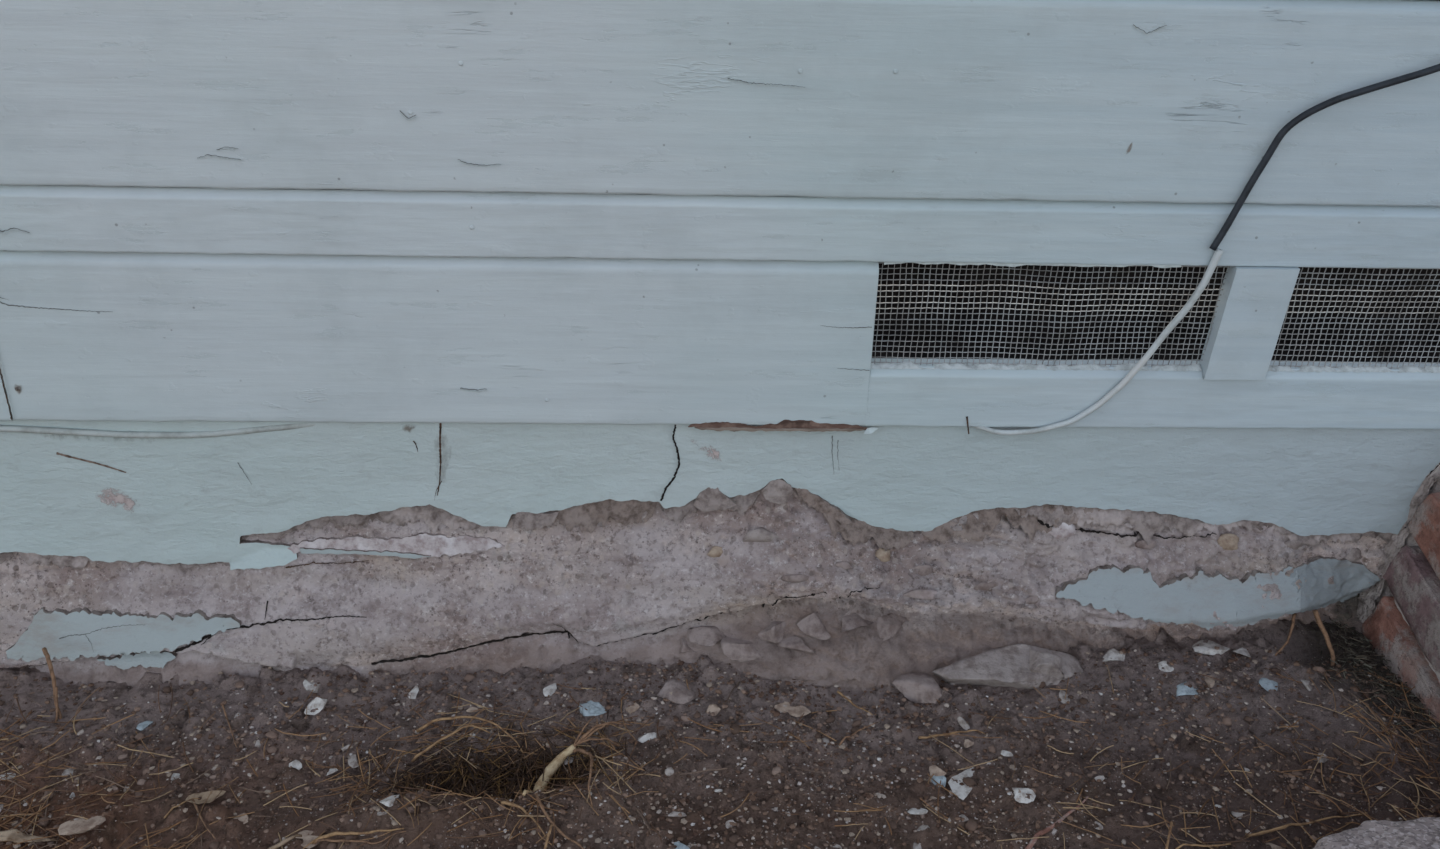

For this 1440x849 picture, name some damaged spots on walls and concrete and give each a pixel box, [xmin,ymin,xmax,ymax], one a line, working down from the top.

crack [413,423,442,496]
crack [658,425,680,501]
crack [286,560,368,568]
spalling [0,479,1393,693]
crack [762,587,880,608]
crack [173,601,367,652]
crack [371,612,723,665]